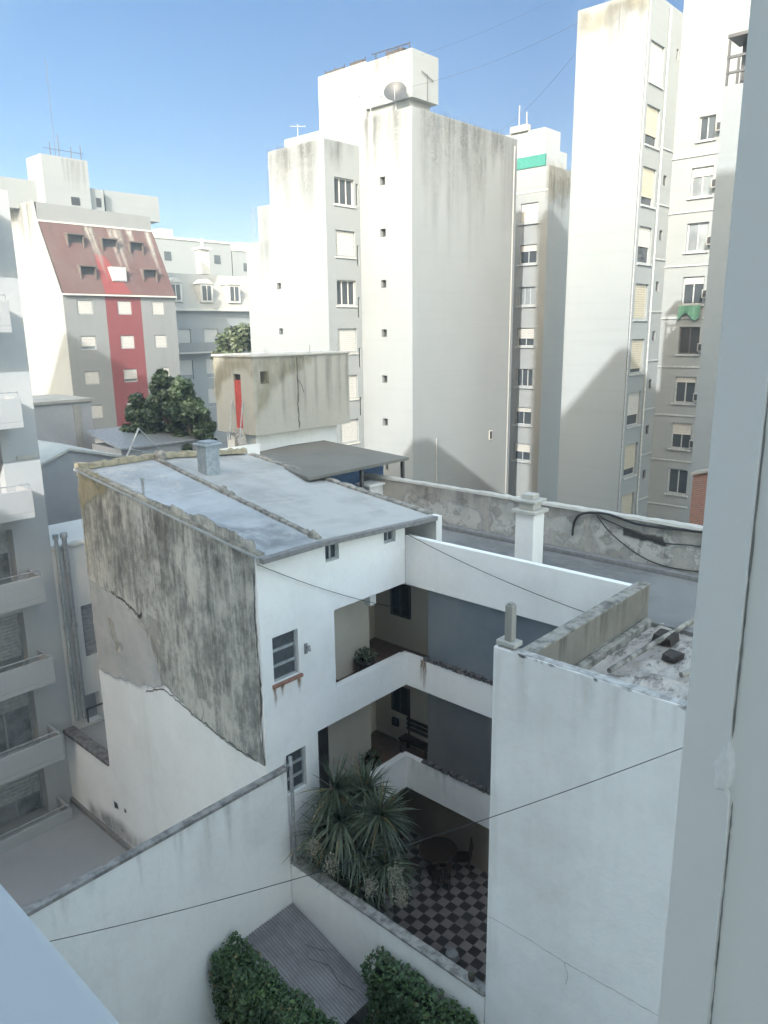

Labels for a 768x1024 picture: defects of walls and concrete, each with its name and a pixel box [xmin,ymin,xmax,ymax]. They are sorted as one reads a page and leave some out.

crack [296,358,304,428]
peeling [403,491,519,536]
peeling [543,514,701,568]
damp [79,474,265,766]
crack [111,577,265,765]
crack [490,917,658,1016]